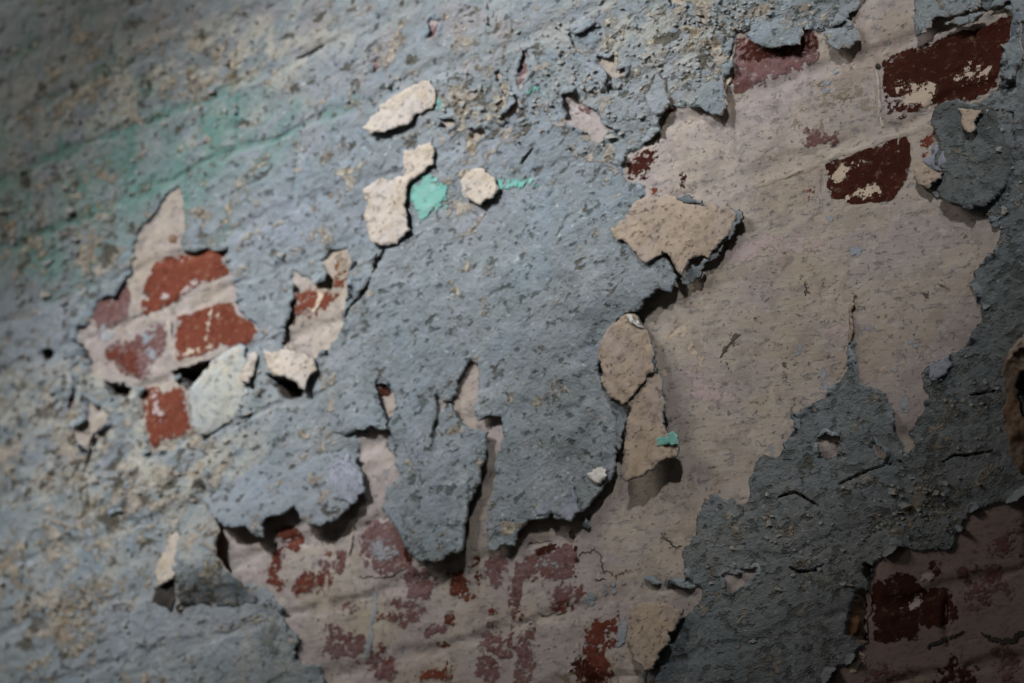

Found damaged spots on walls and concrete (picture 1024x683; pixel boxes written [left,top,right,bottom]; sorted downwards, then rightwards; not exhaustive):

peeling [570,18,596,34]
peeling [362,46,535,144]
peeling [556,86,621,144]
peeling [460,168,500,206]
peeling [60,143,436,457]
peeling [581,0,1024,589]
peeling [152,360,702,683]
crack [778,491,815,504]
crack [839,460,903,484]
peeling [821,334,1024,683]